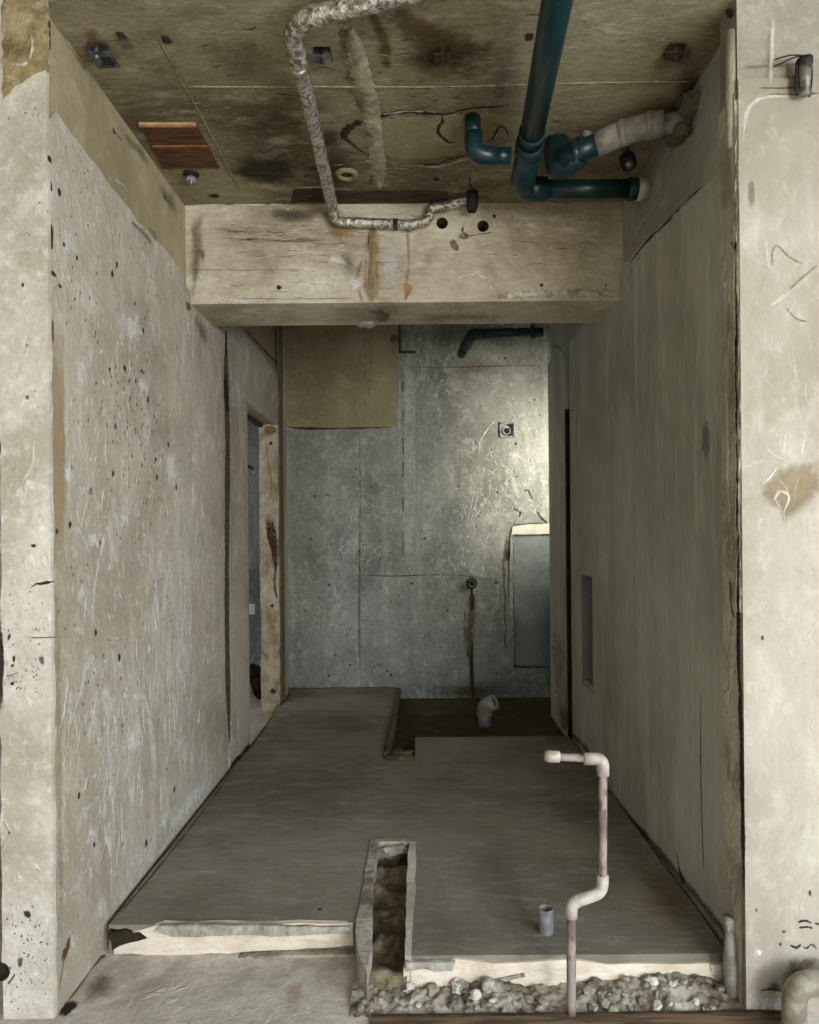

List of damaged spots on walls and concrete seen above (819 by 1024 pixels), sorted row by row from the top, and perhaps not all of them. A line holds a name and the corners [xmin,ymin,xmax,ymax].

crack [340,105,511,190]
leakage [765,468,817,515]
corrosion [266,520,278,597]
corrosion [467,579,478,698]
spalling [109,928,147,950]